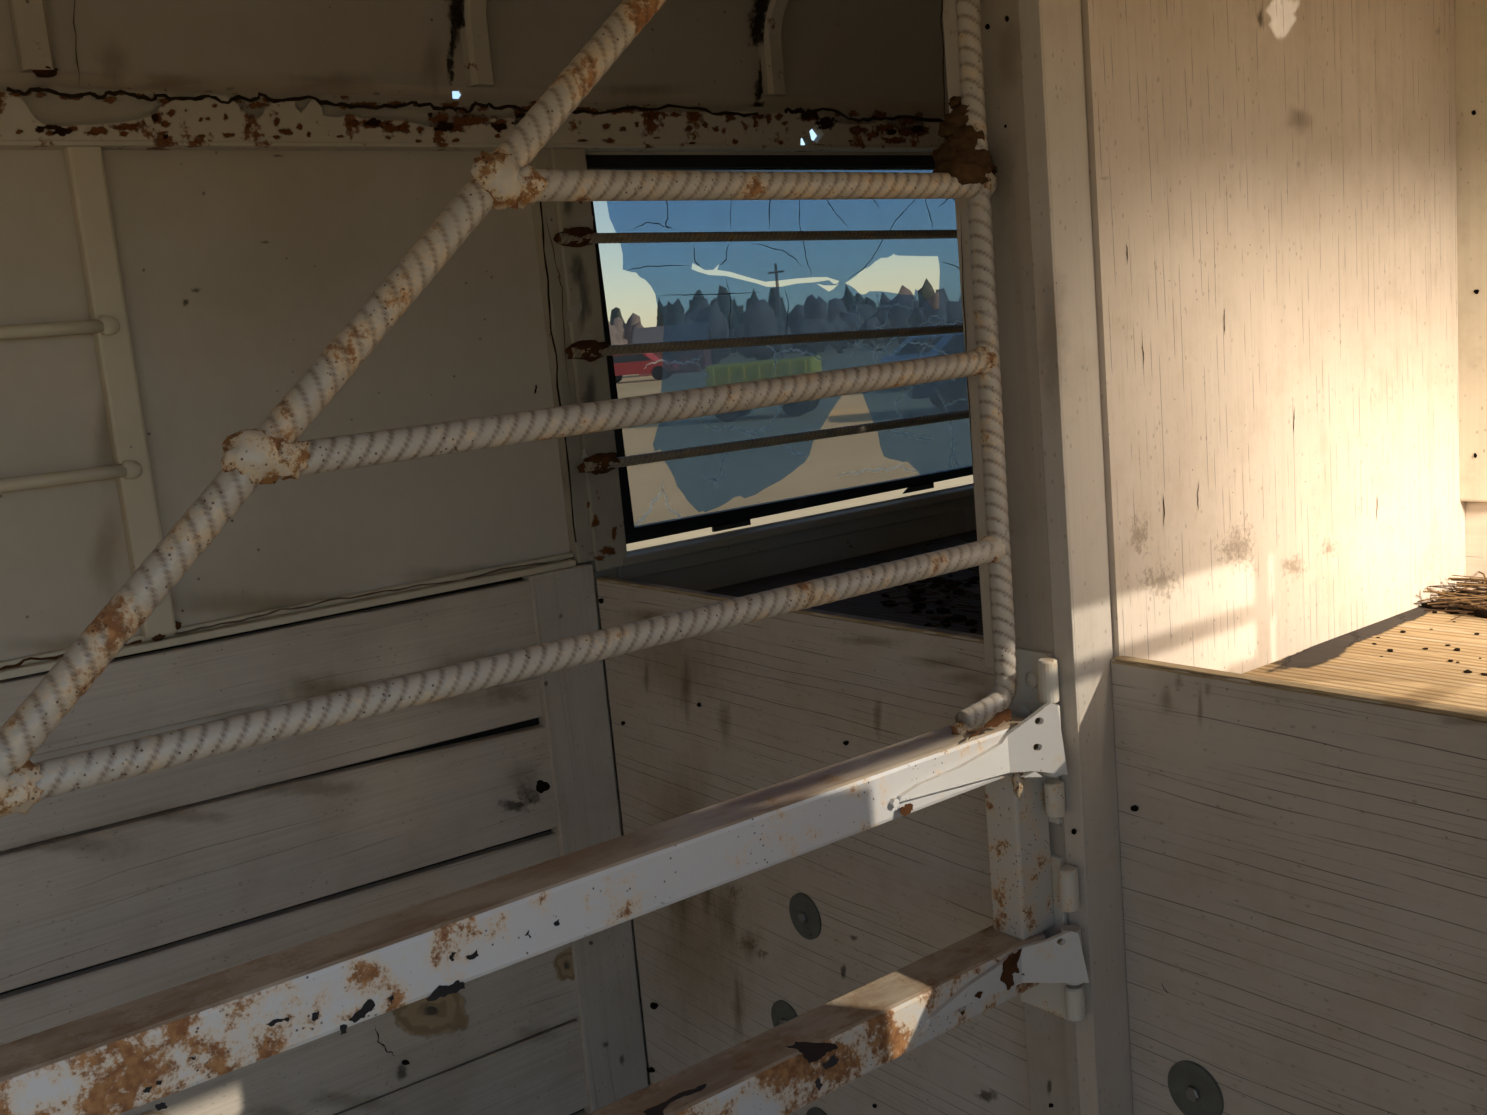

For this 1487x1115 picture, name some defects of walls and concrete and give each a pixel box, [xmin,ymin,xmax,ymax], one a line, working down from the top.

crack [572,0,945,140]
rust [45,93,311,139]
crack [6,87,529,114]
rust [336,101,532,143]
rust [576,107,932,146]
rust [1000,948,1024,990]
peeling [426,980,465,1002]
peeling [340,995,395,1035]
peeling [786,1041,839,1091]
peeling [143,1081,167,1111]
peeling [643,1084,706,1115]